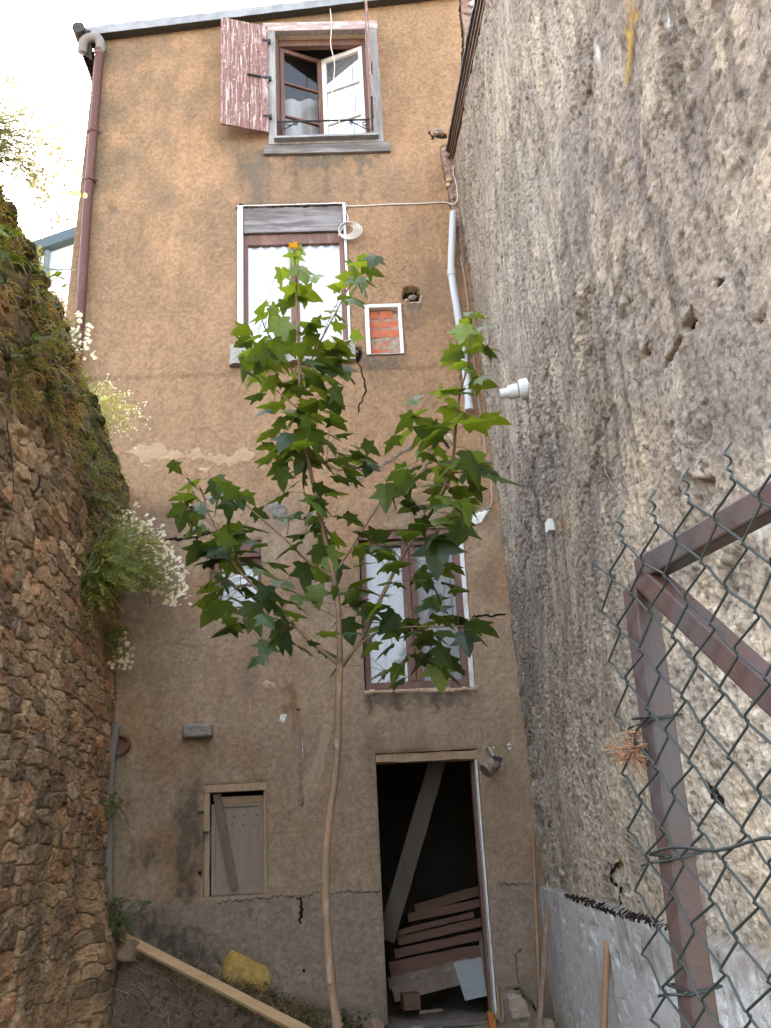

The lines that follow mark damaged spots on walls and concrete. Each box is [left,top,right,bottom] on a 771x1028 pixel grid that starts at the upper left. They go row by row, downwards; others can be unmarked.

crack [218,889,381,924]
crack [564,859,668,931]